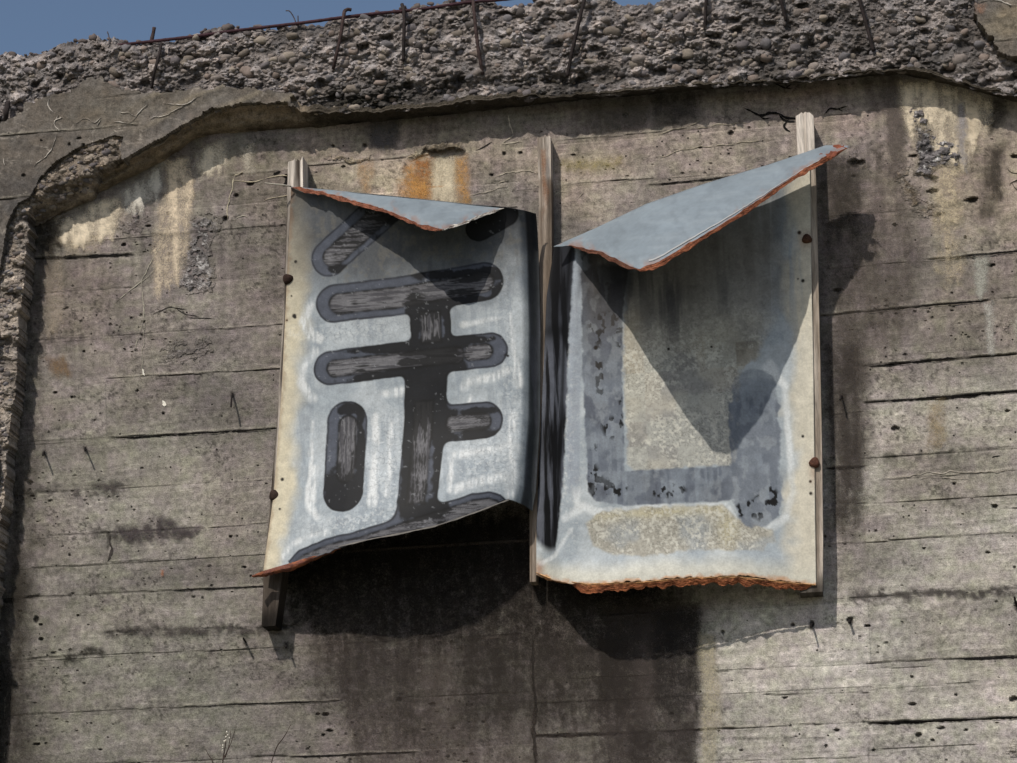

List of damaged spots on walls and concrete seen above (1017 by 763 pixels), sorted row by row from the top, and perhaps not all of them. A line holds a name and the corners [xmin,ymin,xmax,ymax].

spalling [0,136,124,635]
water stain [32,143,225,307]
peeling [176,210,225,295]
spalling [0,0,1017,123]
water stain [822,158,910,531]
peeling [891,106,962,224]
water stain [0,400,35,763]
water stain [288,502,719,763]